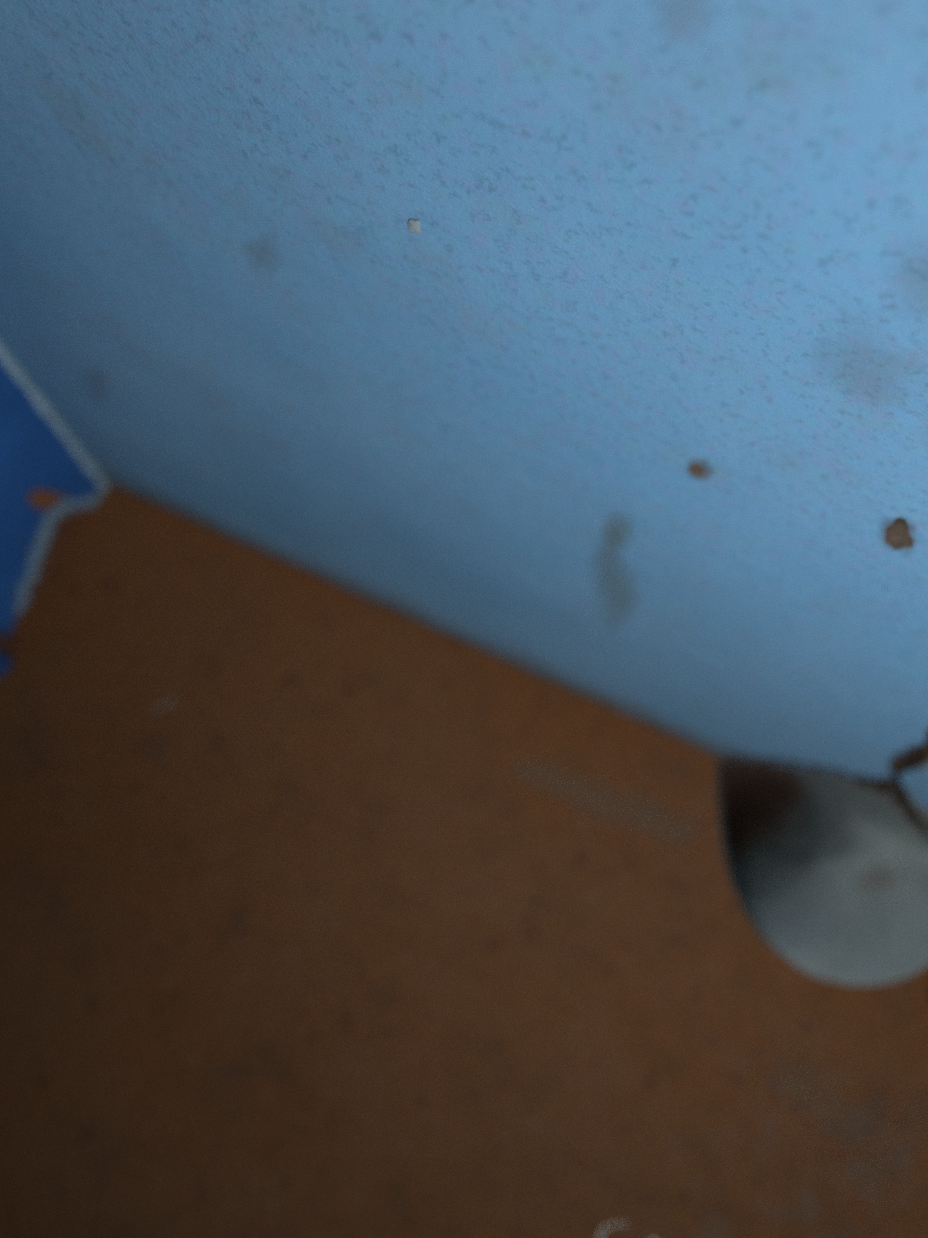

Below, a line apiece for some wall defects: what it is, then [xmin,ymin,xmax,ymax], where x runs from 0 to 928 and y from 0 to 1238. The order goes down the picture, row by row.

spalling [715,755,928,986]
crack [889,730,928,835]